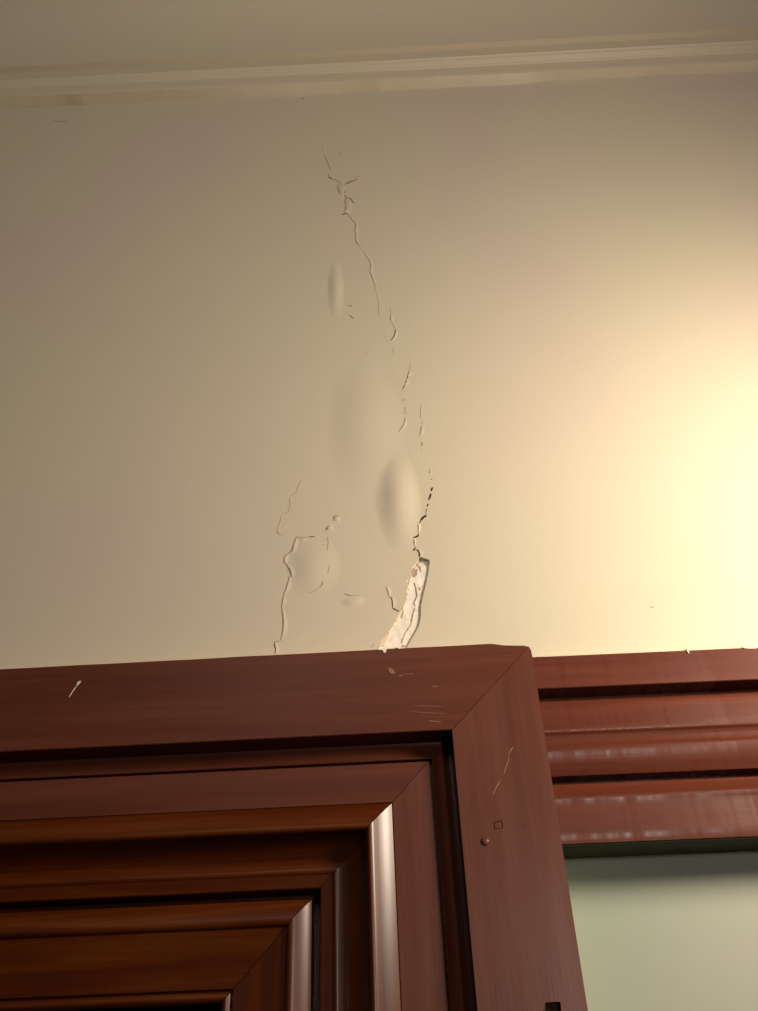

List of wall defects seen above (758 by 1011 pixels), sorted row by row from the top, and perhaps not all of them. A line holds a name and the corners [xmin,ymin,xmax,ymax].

crack [321,145,425,445]
crack [413,469,433,557]
crack [274,480,315,654]
crack [386,587,400,612]
flaking render [372,557,430,649]